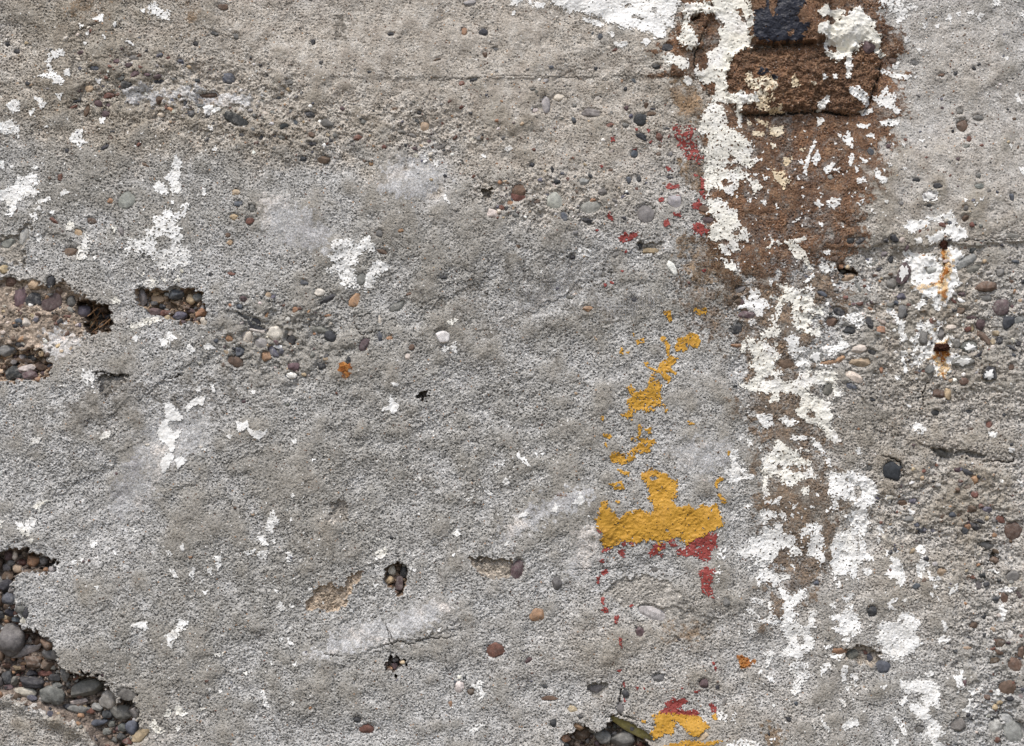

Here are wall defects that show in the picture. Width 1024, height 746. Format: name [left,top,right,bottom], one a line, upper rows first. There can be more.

spalling [0,150,122,385]
peeling [66,129,216,354]
corrosion [912,236,955,304]
peeling [510,0,1024,746]
corrosion [929,337,951,380]
spalling [0,500,188,746]
peeling [168,530,222,598]
peeling [239,493,311,560]
spalling [263,523,416,645]